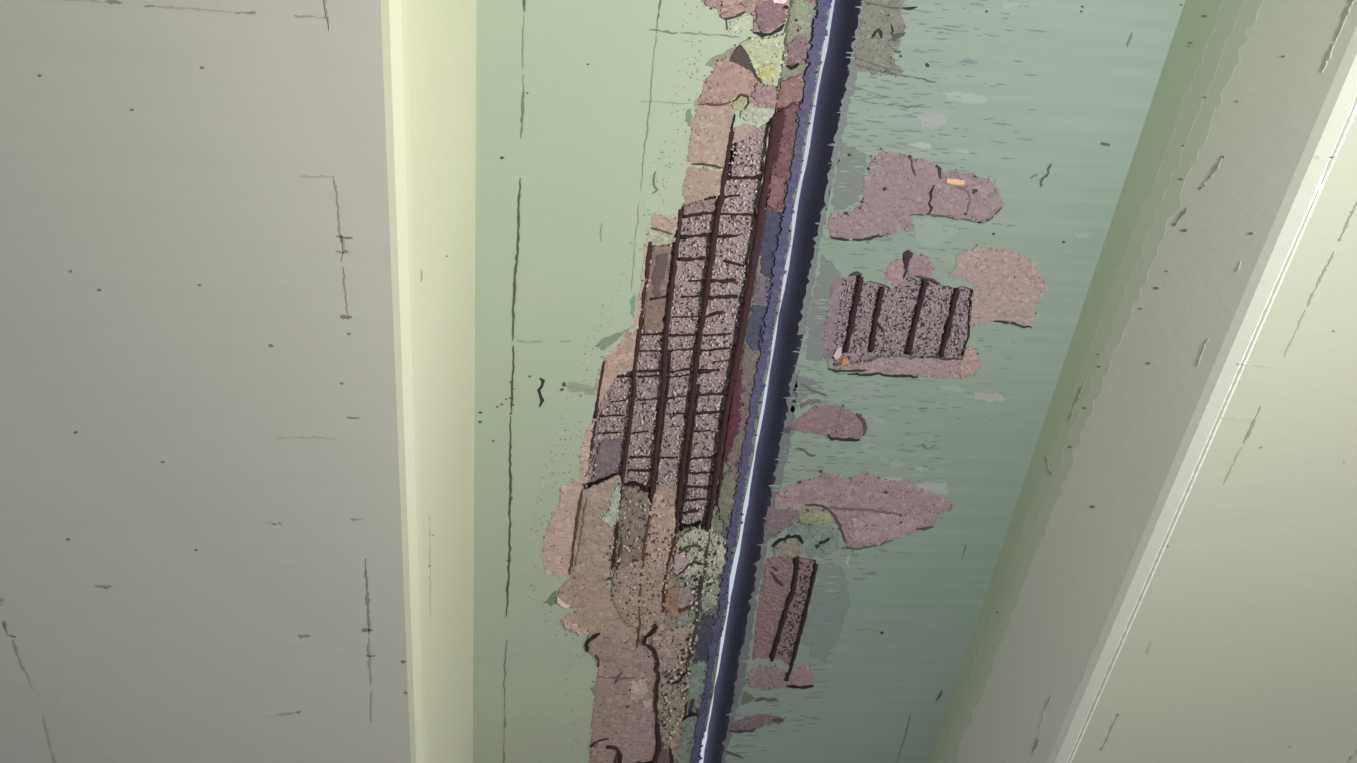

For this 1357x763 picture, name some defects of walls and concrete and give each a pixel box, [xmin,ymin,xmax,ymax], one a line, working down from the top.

crack [301,175,353,319]
spalling [822,148,1049,380]
spalling [539,0,818,763]
corrosion [723,370,746,461]
spalling [789,404,869,442]
spalling [745,470,953,692]
crack [0,597,57,763]